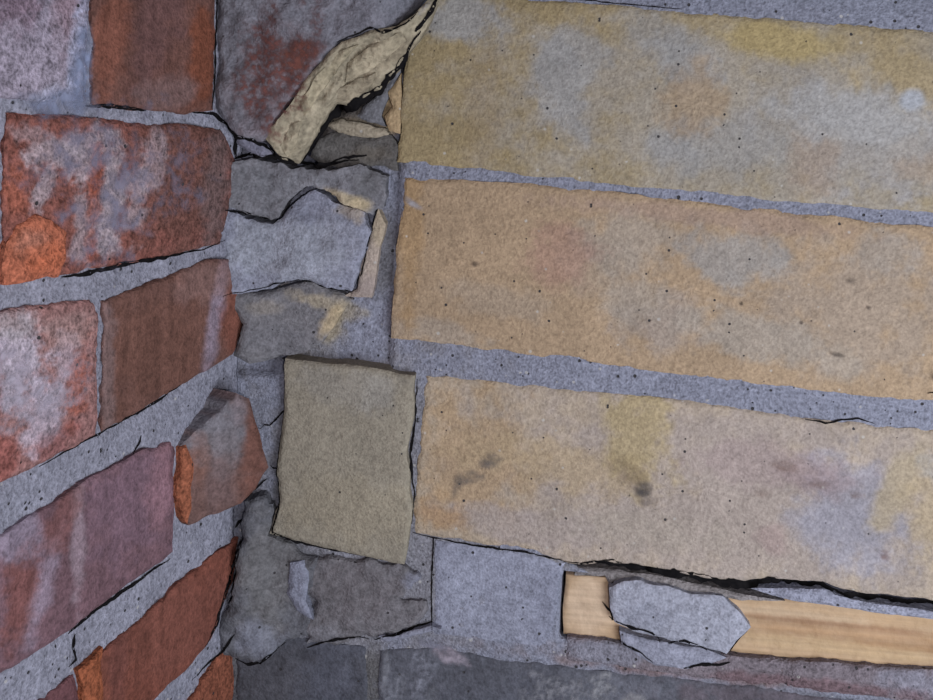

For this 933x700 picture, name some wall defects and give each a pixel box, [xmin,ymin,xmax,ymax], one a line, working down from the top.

crack [192,0,437,170]
crack [192,410,356,681]
crack [307,379,933,648]
crack [603,603,747,669]
peeling [609,576,751,669]